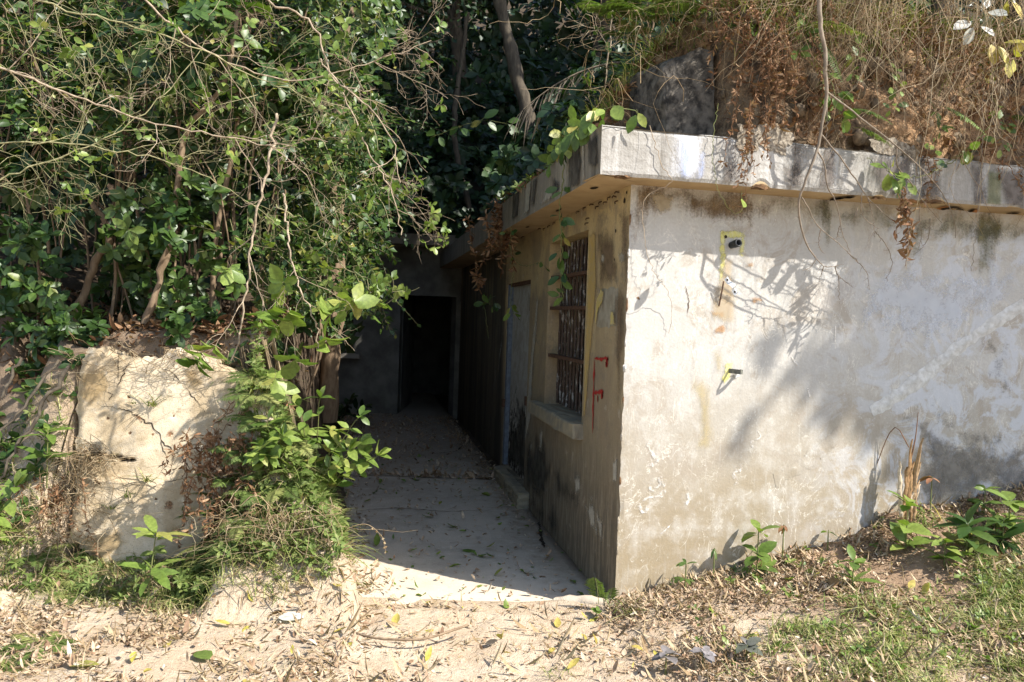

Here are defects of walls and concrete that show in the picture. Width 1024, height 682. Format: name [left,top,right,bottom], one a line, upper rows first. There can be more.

damp [692,196,751,216]
damp [999,170,1024,206]
damp [720,231,743,277]
damp [583,218,627,414]
damp [509,406,574,498]